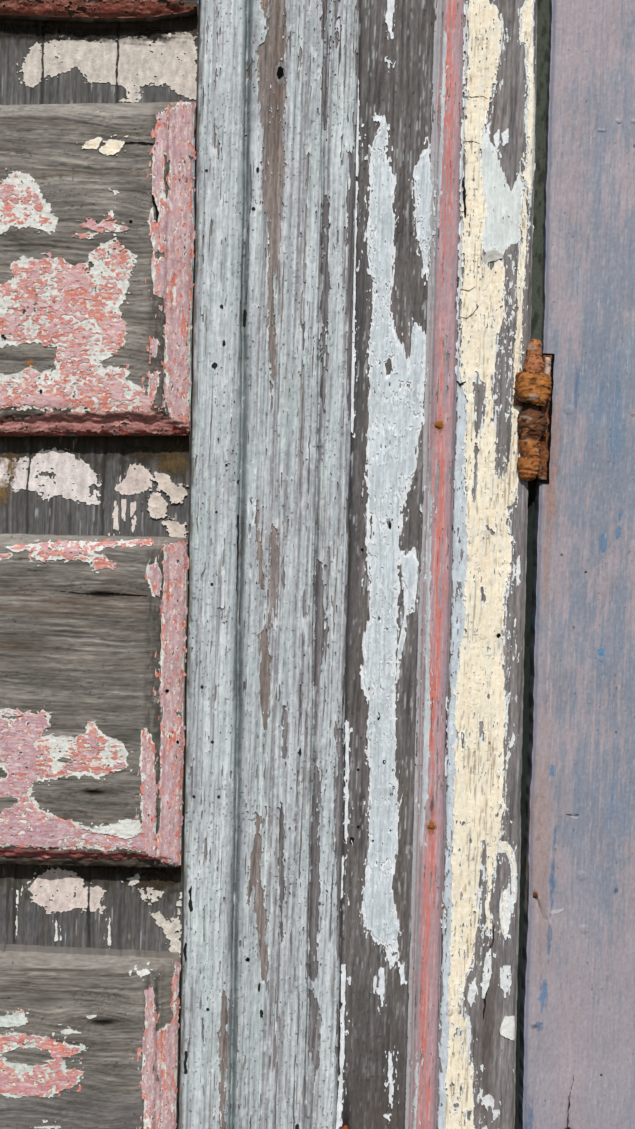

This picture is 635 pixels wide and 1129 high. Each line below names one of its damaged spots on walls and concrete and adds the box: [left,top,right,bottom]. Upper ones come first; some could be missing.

peeling [0,0,197,19]
peeling [0,32,208,1129]
peeling [245,0,536,1129]